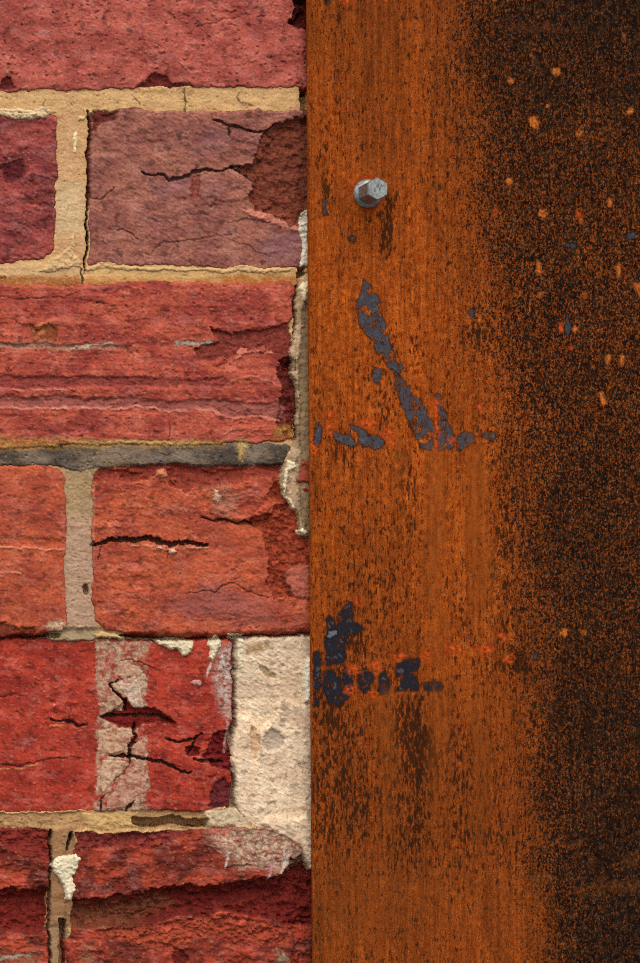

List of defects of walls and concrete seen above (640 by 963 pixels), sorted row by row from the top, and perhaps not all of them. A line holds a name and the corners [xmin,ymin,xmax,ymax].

crack [141,166,252,182]
peeling [357,280,495,451]
crack [90,535,207,547]
crack [203,517,251,525]
peeling [313,602,443,706]
crack [50,680,223,774]